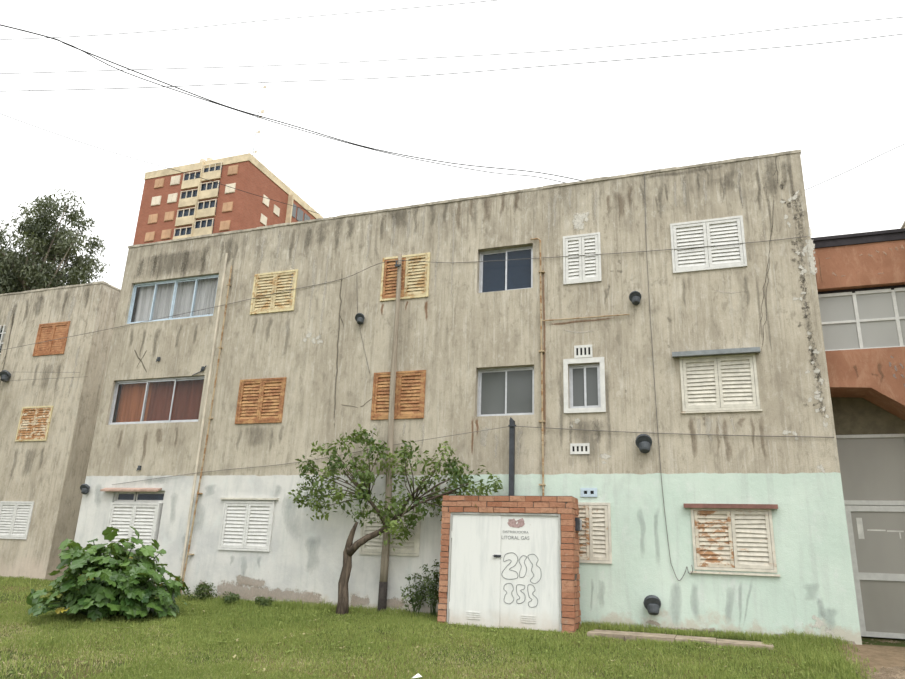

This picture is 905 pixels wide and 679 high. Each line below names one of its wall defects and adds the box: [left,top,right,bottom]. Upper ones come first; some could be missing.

crack [759,156,778,350]
peeling [795,227,829,275]
peeling [805,331,829,427]